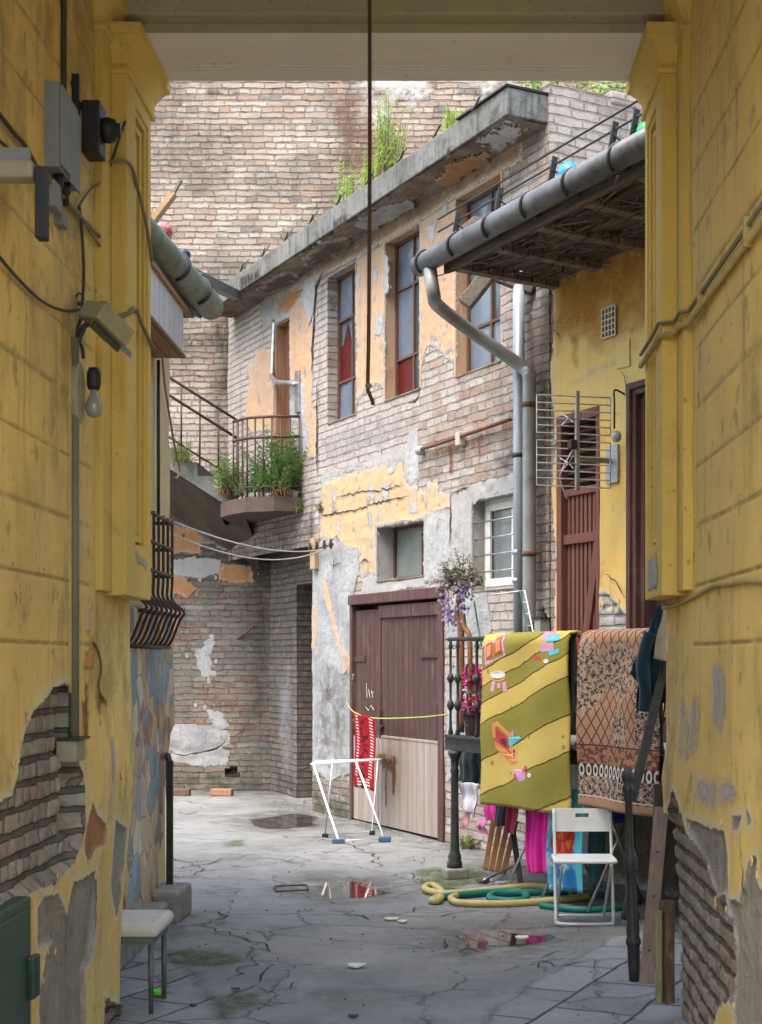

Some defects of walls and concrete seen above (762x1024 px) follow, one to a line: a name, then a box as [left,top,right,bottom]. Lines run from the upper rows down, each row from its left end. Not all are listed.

flaking render [256,121,529,462]
flaking render [243,347,276,433]
crack [321,485,406,519]
flaking render [169,514,262,641]
flaking render [311,427,513,784]
flaking render [185,633,218,684]
flaking render [194,703,231,730]
flaking render [170,746,240,777]
spalling [0,682,131,1024]
spalling [602,775,762,1024]
crack [201,923,274,986]